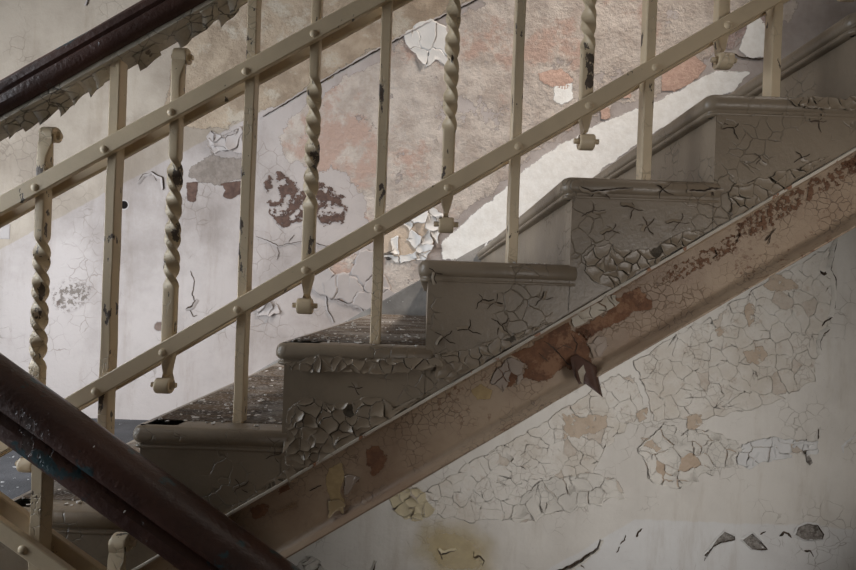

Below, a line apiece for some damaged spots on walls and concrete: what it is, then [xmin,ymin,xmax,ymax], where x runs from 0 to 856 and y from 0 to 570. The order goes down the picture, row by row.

flaking render [174,0,248,94]
flaking render [258,0,515,231]
peeling [312,164,509,311]
peeling [519,89,639,217]
flaking render [522,0,642,133]
crack [578,182,724,235]
peeling [652,45,750,134]
crack [734,52,764,60]
corrosion [662,158,856,283]
crack [816,238,838,355]
crack [438,548,485,567]
crack [559,529,642,570]